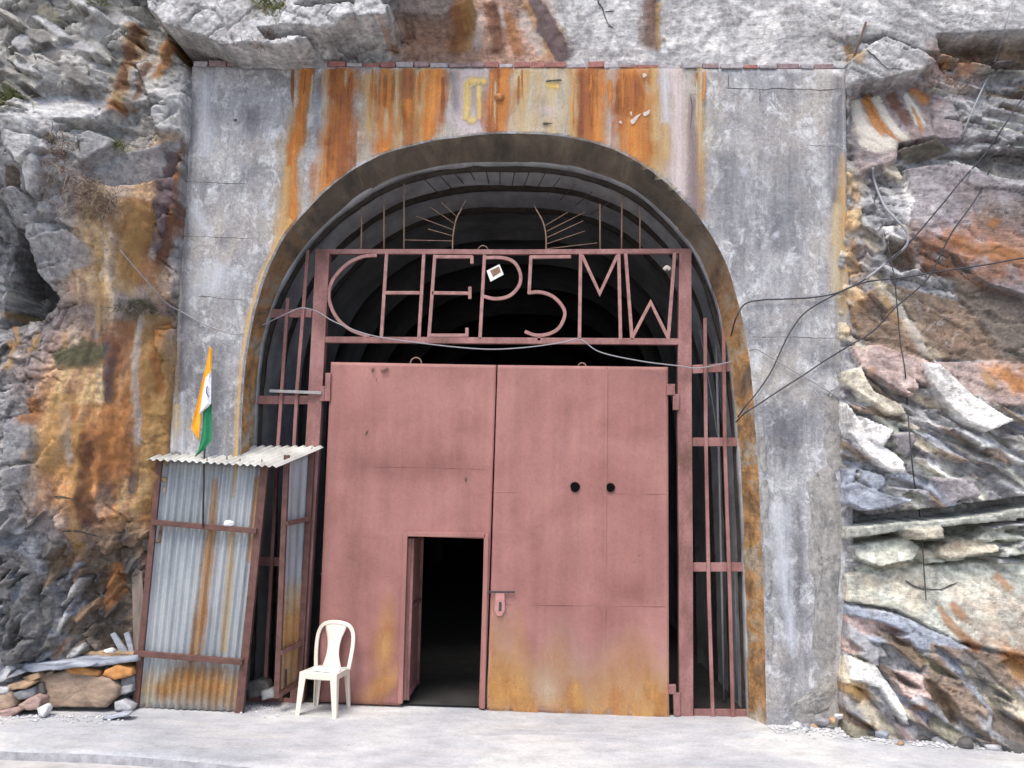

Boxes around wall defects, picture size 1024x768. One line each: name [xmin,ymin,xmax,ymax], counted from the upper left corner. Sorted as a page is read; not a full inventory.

corrosion [569,68,663,173]
corrosion [688,68,706,215]
corrosion [233,68,527,496]
corrosion [832,161,847,310]
corrosion [141,668,238,696]
corrosion [191,480,215,655]
corrosion [281,592,301,690]
corrosion [488,665,668,717]